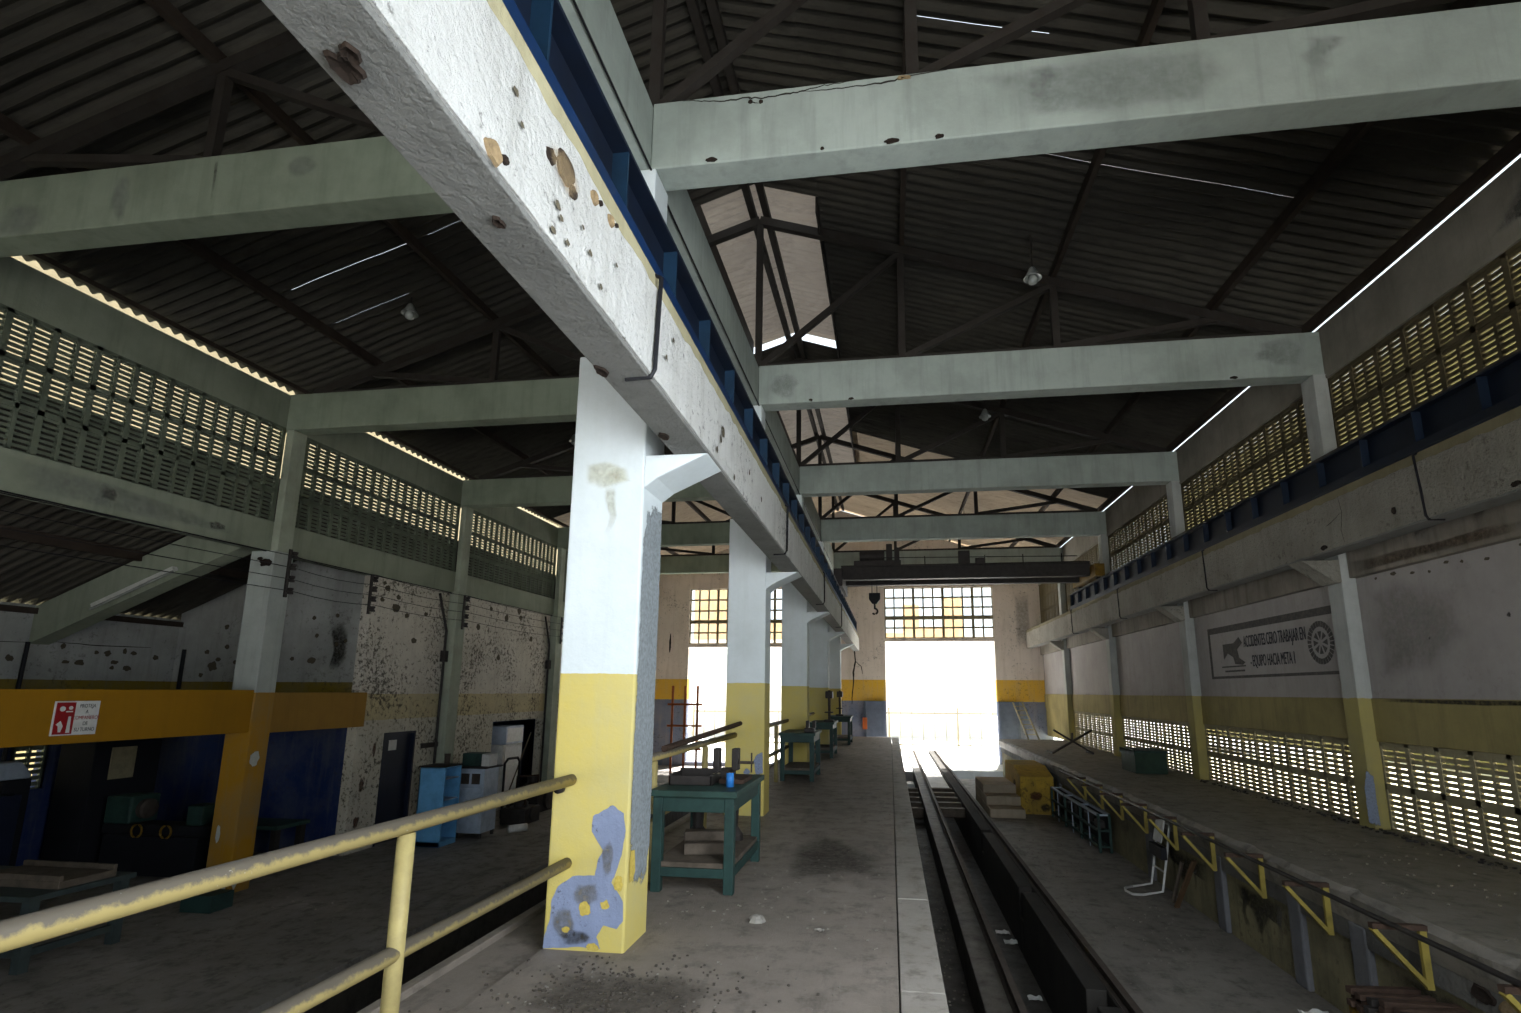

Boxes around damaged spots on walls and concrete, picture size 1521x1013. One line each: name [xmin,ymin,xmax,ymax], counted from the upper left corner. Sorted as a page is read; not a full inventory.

peeling [543,507,662,951]